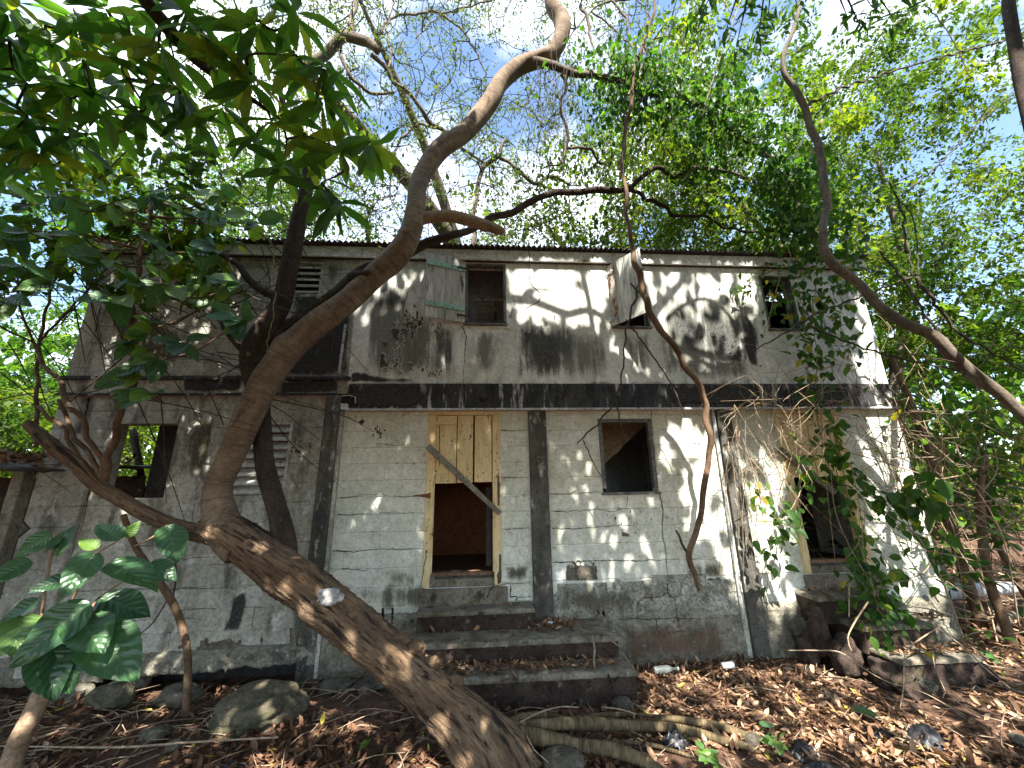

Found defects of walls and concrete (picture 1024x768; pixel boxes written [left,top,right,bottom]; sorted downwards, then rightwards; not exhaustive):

peeling [379,304,446,378]
damp [524,327,605,375]
damp [666,297,758,375]
crack [552,412,721,634]